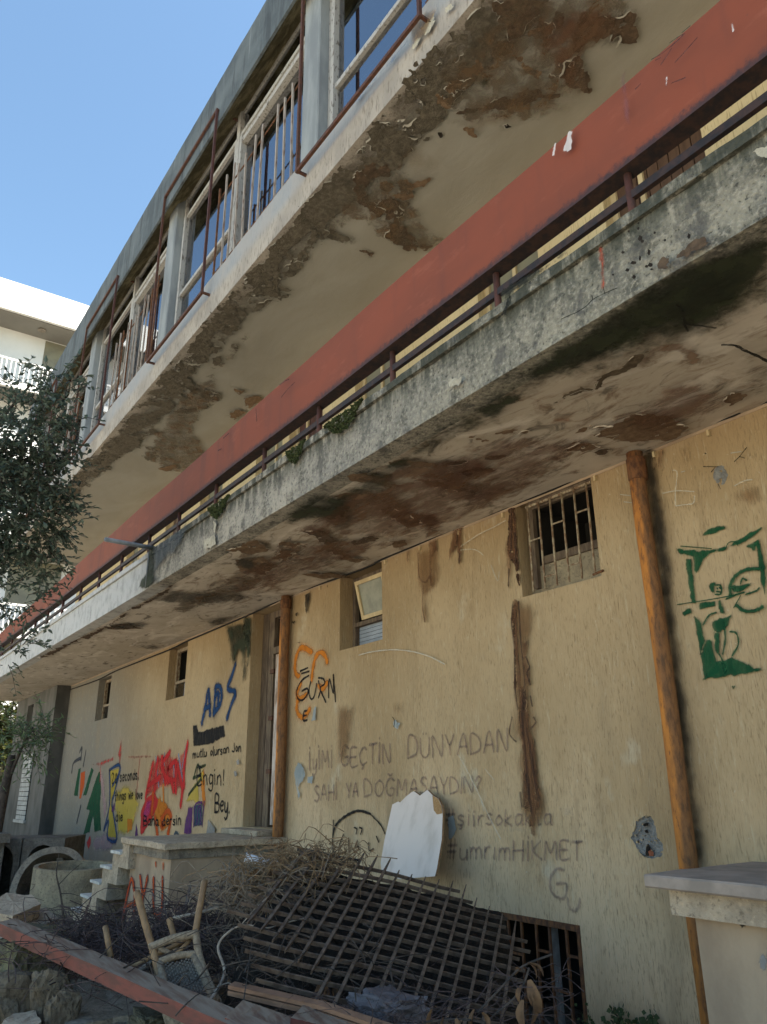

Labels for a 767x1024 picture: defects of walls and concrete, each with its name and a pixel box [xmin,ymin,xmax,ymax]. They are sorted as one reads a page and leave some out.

peeling [56,0,639,503]
damp [140,240,767,622]
damp [209,617,251,679]
corrosion [509,600,544,836]
flaking render [631,816,663,859]